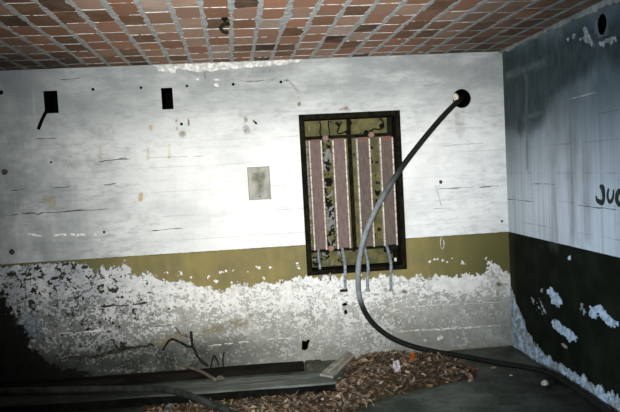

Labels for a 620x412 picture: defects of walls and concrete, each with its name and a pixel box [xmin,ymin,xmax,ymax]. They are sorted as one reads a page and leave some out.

water stain [505,25,620,133]
peeling [0,257,620,412]